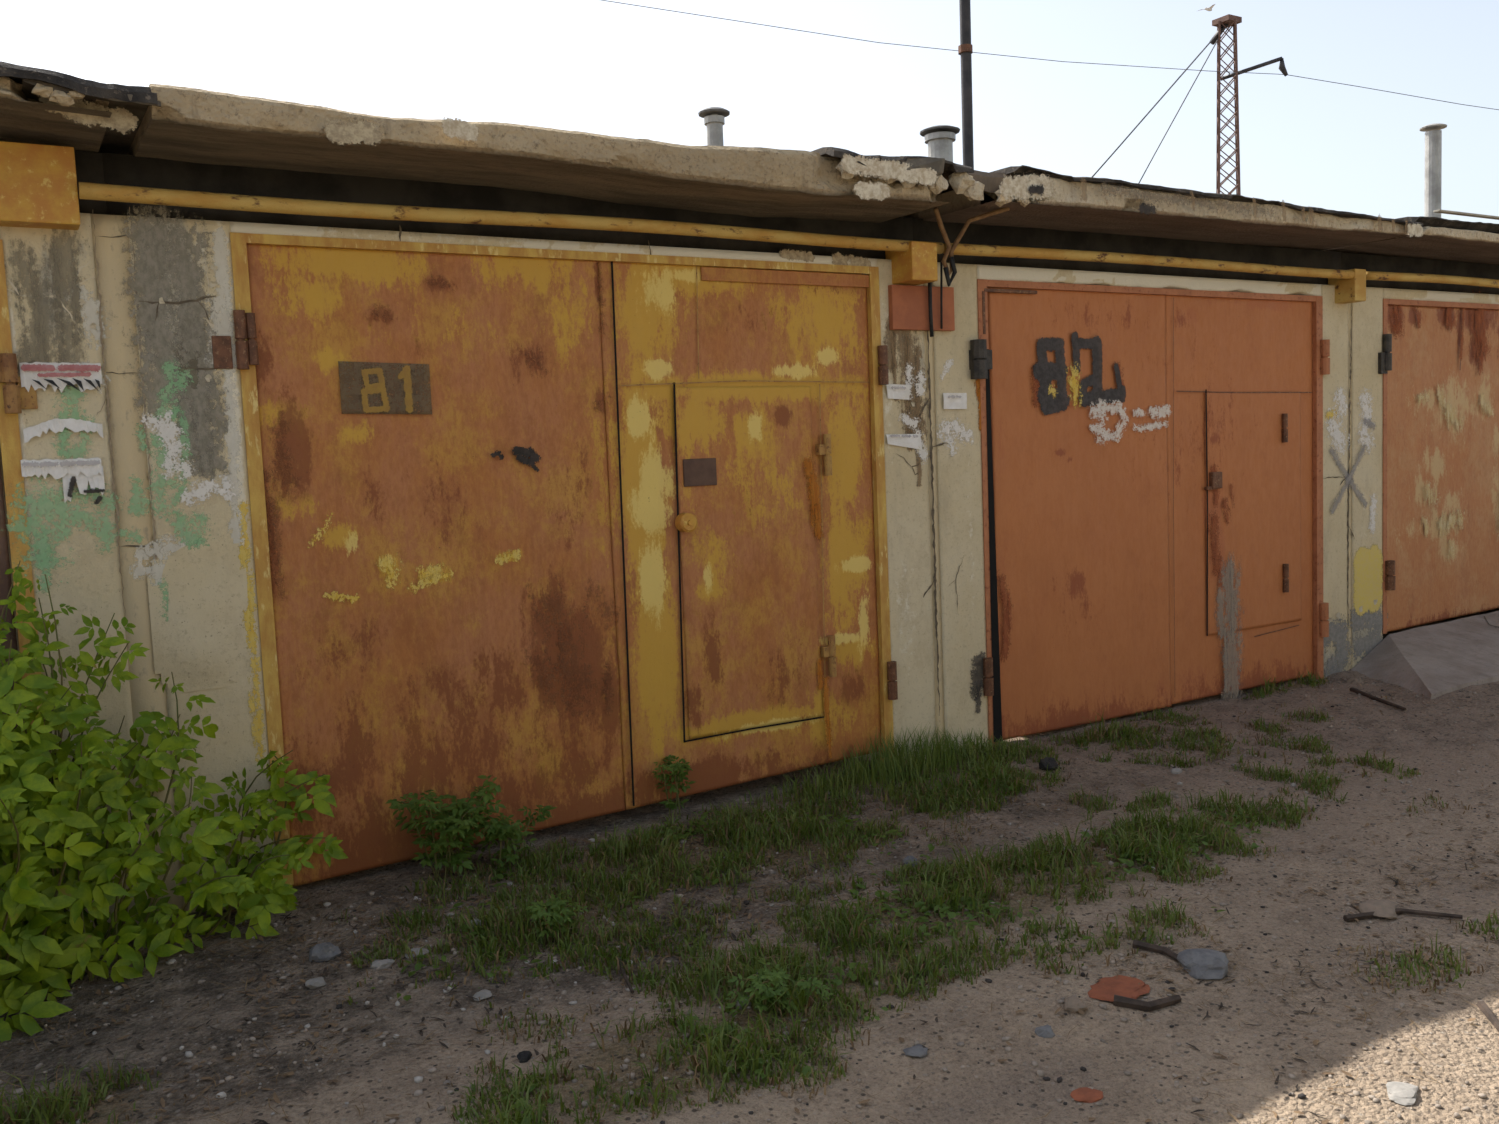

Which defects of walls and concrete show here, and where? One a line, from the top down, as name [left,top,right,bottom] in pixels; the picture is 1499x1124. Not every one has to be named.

spalling [31,83,139,135]
spalling [836,153,1054,207]
peeling [63,285,111,393]
peeling [121,205,266,762]